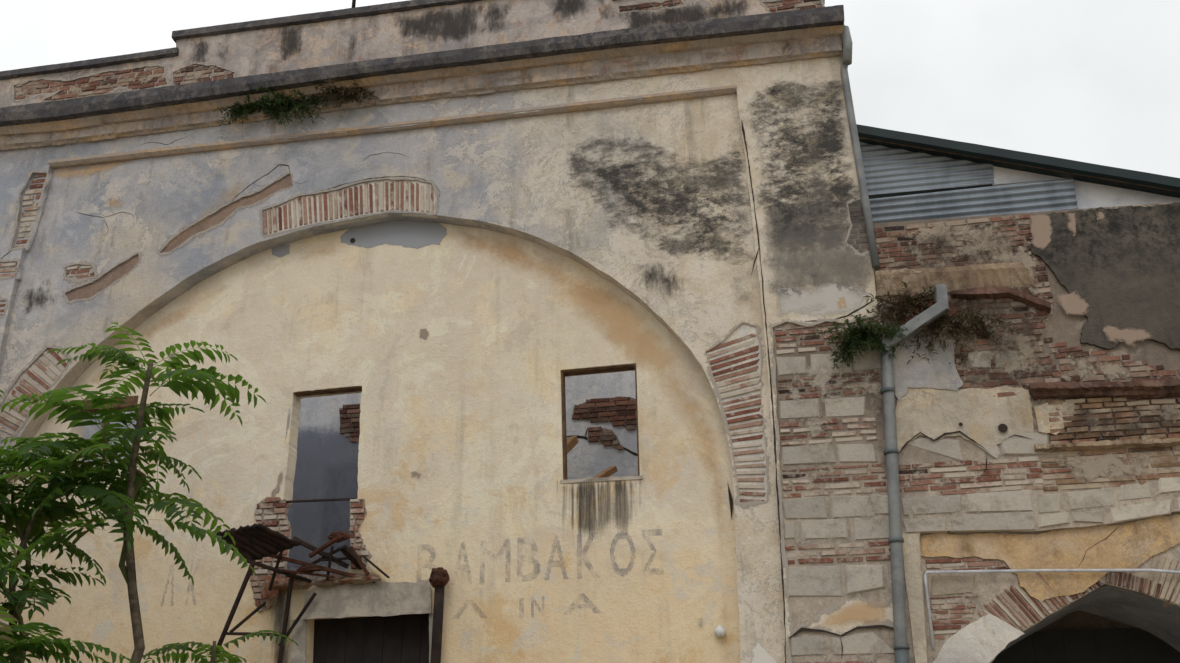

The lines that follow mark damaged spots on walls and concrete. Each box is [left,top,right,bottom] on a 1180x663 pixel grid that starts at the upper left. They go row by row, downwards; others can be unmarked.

mould [400,6,507,40]
mould [554,0,584,16]
spalling [0,170,53,281]
spalling [157,171,447,257]
water stain [571,82,867,293]
peeling [63,252,143,305]
peeling [1058,292,1089,315]
peeling [1103,326,1150,345]
crack [741,119,894,663]
spalling [704,283,904,663]
water stain [572,482,626,533]